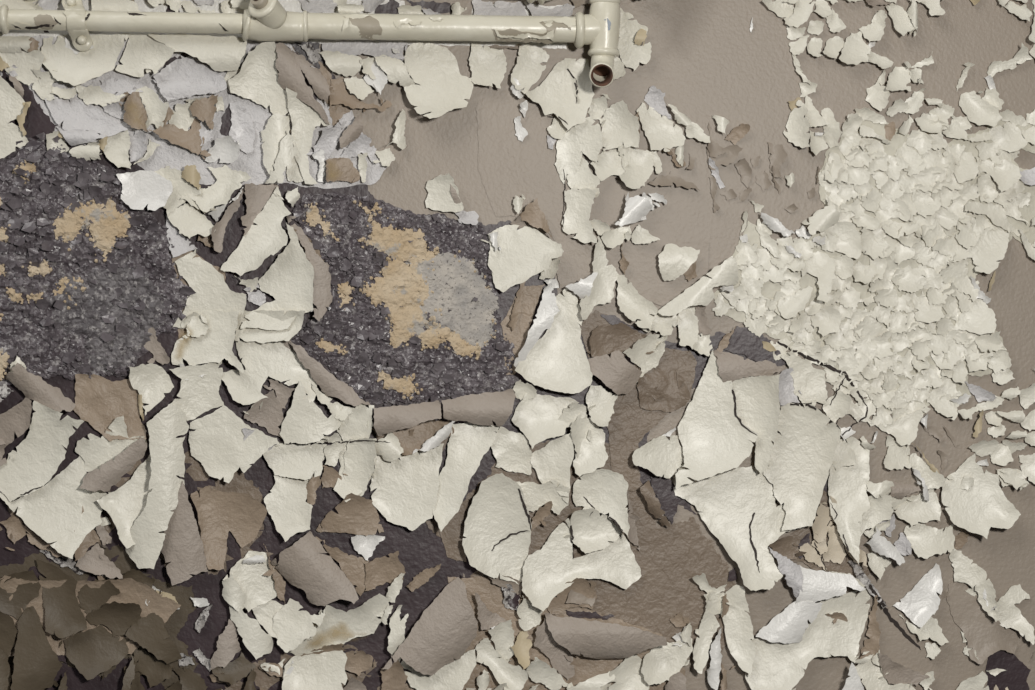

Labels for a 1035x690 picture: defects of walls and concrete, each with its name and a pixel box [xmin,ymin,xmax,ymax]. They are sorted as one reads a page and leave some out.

peeling [0,0,65,10]
peeling [82,0,250,14]
peeling [278,0,590,31]
peeling [494,29,555,41]
peeling [604,8,652,80]
spalling [0,33,894,603]
peeling [692,0,1035,690]
peeling [0,544,267,690]
peeling [213,454,478,690]
peeling [343,372,693,690]